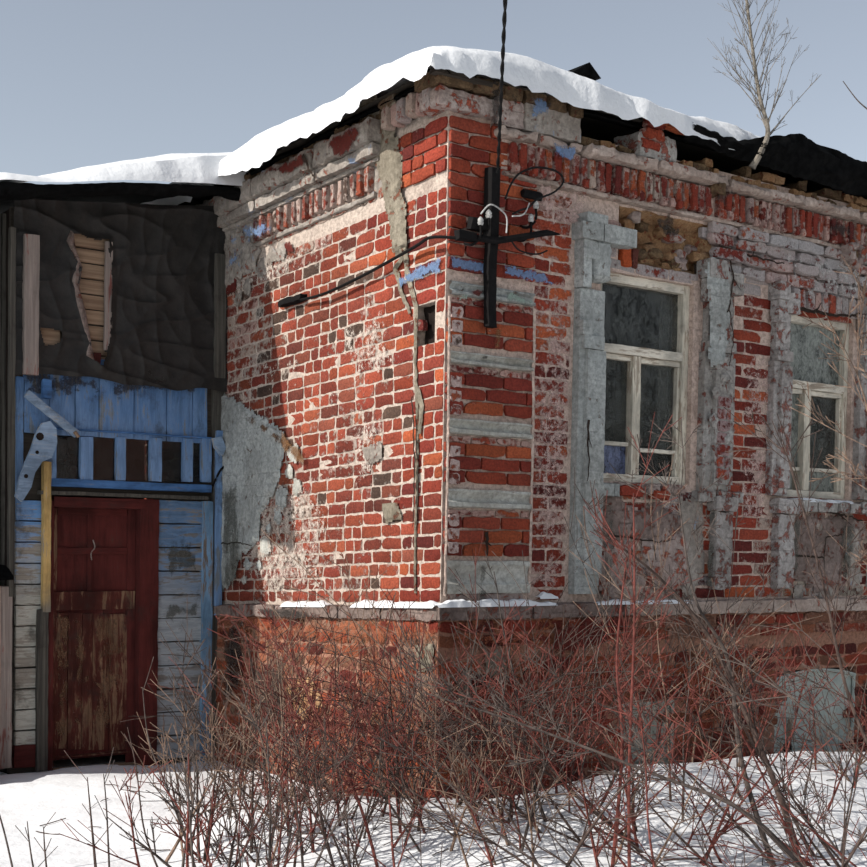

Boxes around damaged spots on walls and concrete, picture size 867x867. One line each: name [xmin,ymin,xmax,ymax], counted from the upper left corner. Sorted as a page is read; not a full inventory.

spalling [269,154,305,173]
spalling [328,127,358,156]
crack [359,94,424,593]
spalling [618,206,731,399]
flaking render [221,393,301,591]